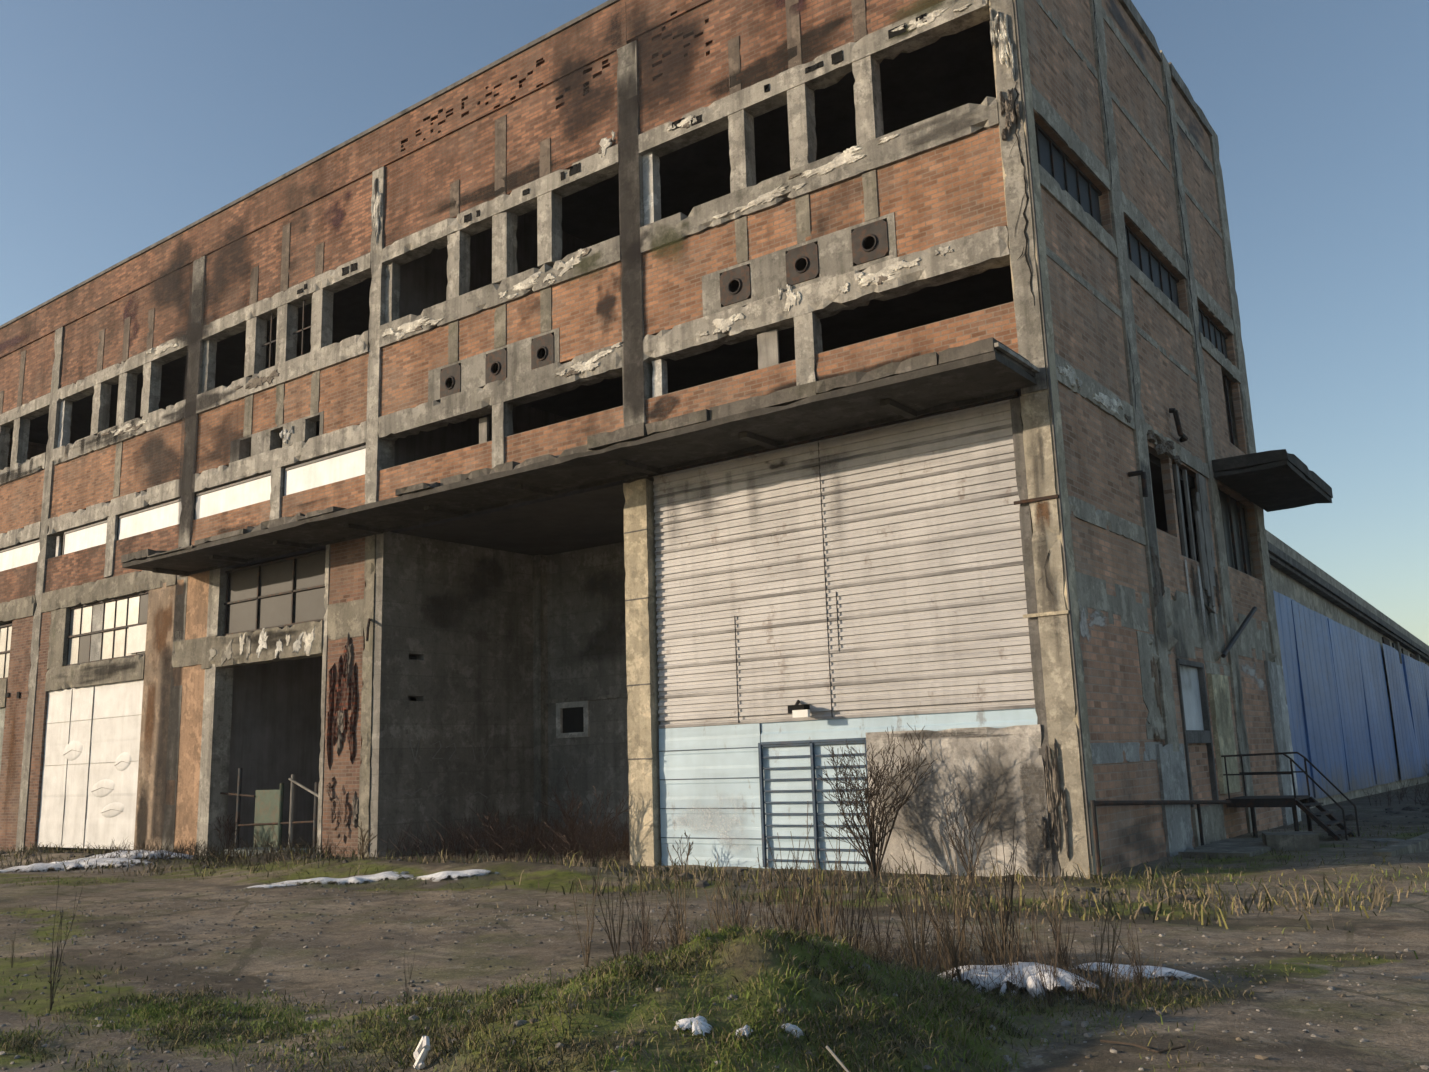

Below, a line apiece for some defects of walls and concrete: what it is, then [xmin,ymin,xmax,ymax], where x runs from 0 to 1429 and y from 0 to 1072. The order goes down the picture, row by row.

water stain [710,17,844,95]
spalling [712,133,901,219]
crack [1009,82,1035,306]
spalling [499,248,592,300]
spalling [778,284,802,311]
spalling [838,246,954,294]
water stain [965,760,1053,874]